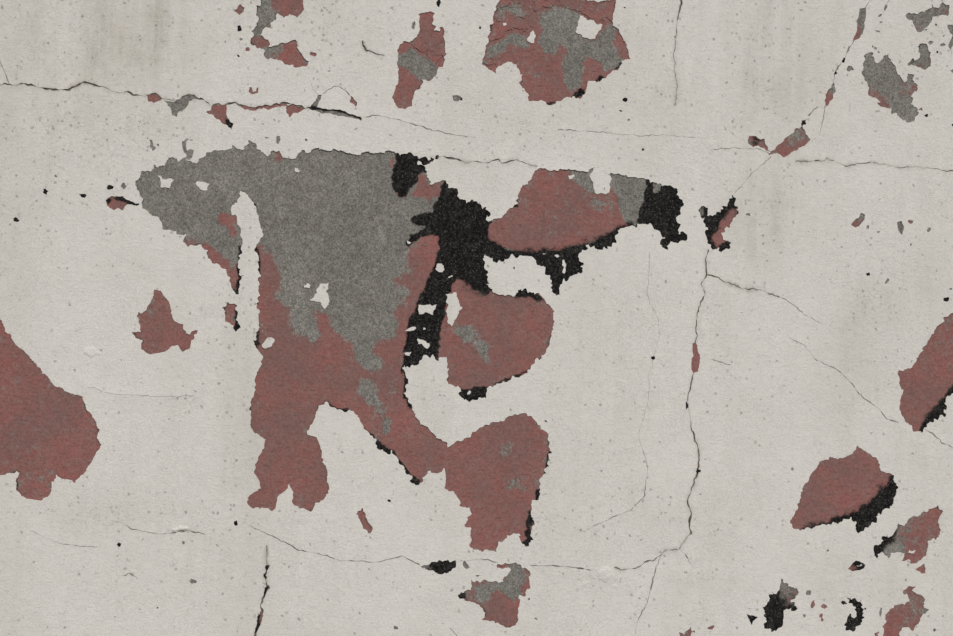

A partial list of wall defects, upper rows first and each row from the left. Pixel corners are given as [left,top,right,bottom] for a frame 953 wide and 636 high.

crack [0,62,537,167]
peeling [392,0,446,109]
peeling [479,0,630,105]
crack [673,0,682,101]
crack [809,1,889,127]
peeling [846,3,953,123]
peeling [0,320,101,501]
peeling [106,136,687,552]
crack [615,250,818,633]
peeling [790,446,898,533]
crack [792,339,898,423]
peeling [898,313,953,433]